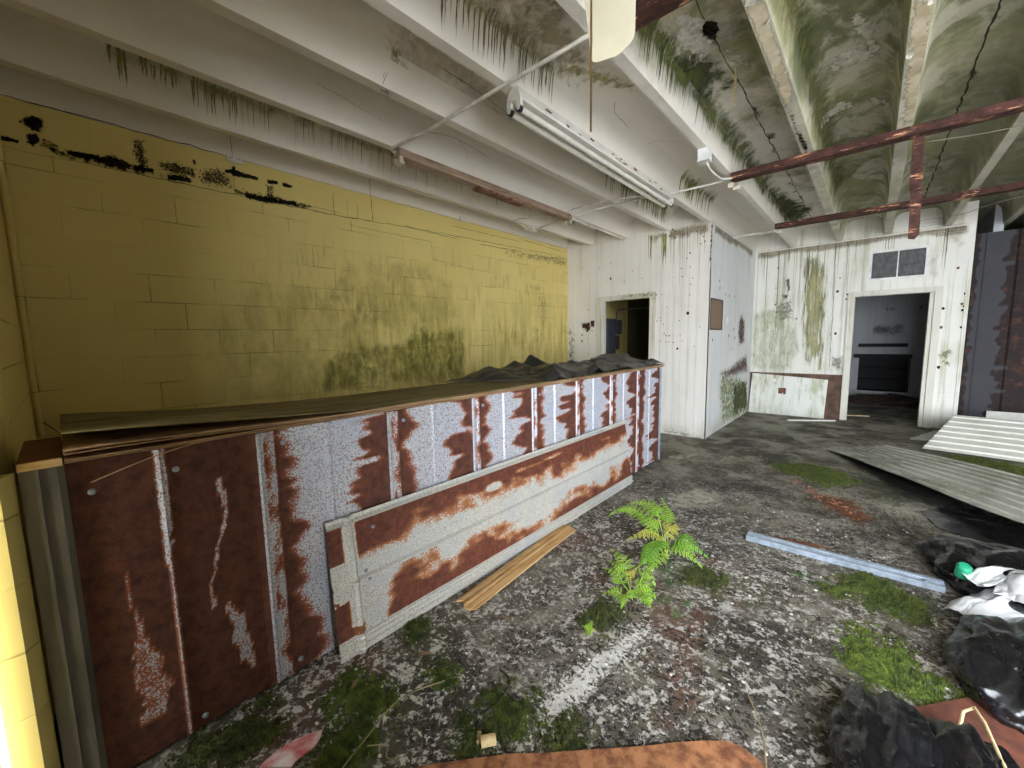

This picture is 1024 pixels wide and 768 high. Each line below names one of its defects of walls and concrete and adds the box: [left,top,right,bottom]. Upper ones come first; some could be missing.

water stain [107,44,127,82]
water stain [1,116,311,208]
water stain [139,56,274,126]
water stain [441,0,584,100]
water stain [638,14,789,222]
crack [696,0,816,226]
water stain [776,0,854,198]
water stain [828,11,881,73]
crack [921,0,1002,207]
water stain [606,173,966,320]